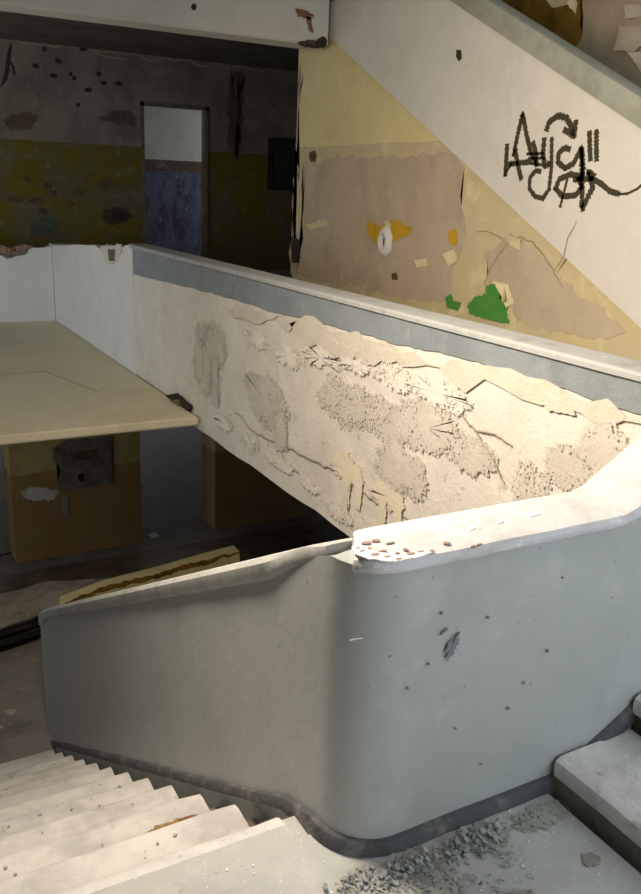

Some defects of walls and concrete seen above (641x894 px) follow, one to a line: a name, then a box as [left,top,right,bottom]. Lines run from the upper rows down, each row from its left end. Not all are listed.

corrosion [295,8,316,33]
peeling [501,0,641,83]
corrosion [227,70,246,158]
peeling [289,63,627,340]
spalling [0,244,36,259]
flaking render [226,303,641,428]
flaking render [52,436,114,491]
crack [234,411,407,519]
crack [446,397,512,483]
spalling [352,539,451,563]